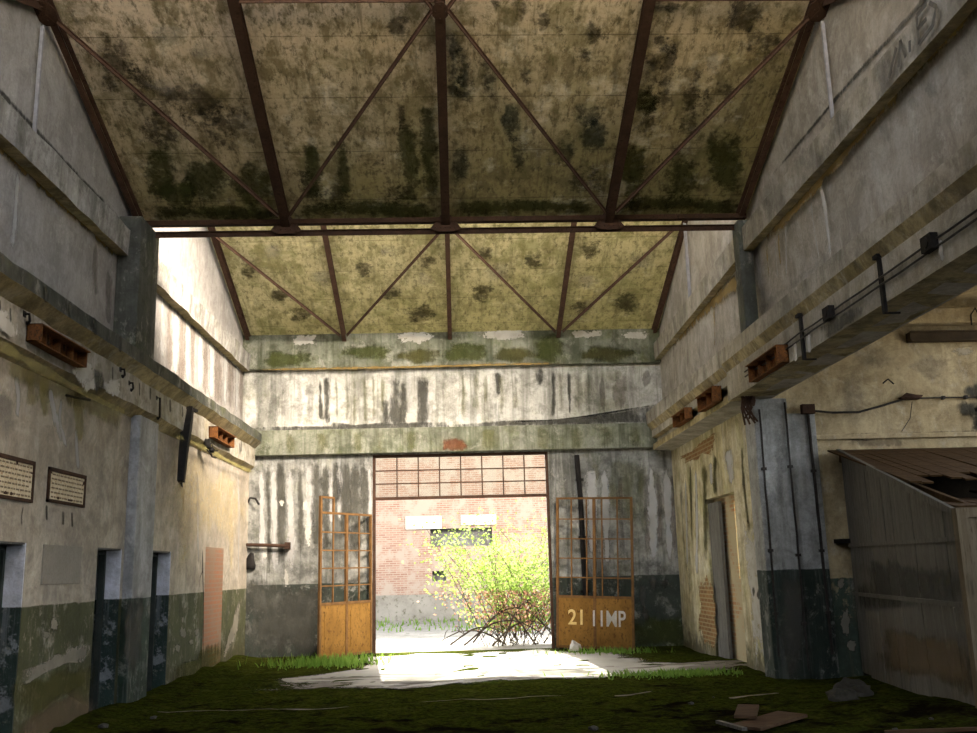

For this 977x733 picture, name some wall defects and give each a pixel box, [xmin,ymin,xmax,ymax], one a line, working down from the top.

damp [636,36,677,135]
damp [299,106,438,217]
damp [457,105,609,217]
damp [615,132,744,213]
damp [408,304,436,322]
damp [319,378,330,422]
damp [383,380,428,424]
damp [536,369,571,415]
damp [258,463,372,569]
damp [587,471,610,561]
damp [648,450,749,572]
peeling [271,522,764,690]